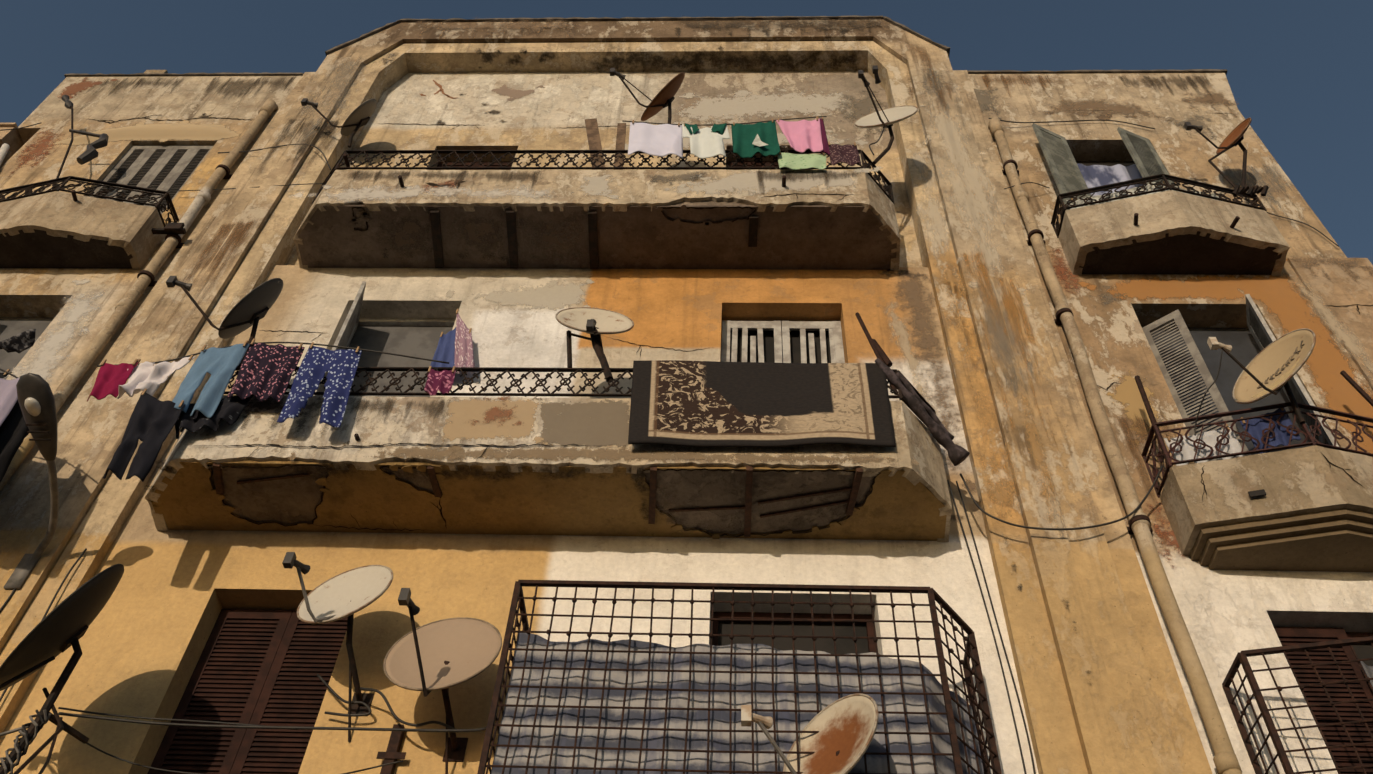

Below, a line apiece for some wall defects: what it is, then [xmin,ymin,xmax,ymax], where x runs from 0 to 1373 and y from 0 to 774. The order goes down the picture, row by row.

spalling [207,452,330,527]
spalling [363,395,919,539]
crack [1323,455,1365,488]